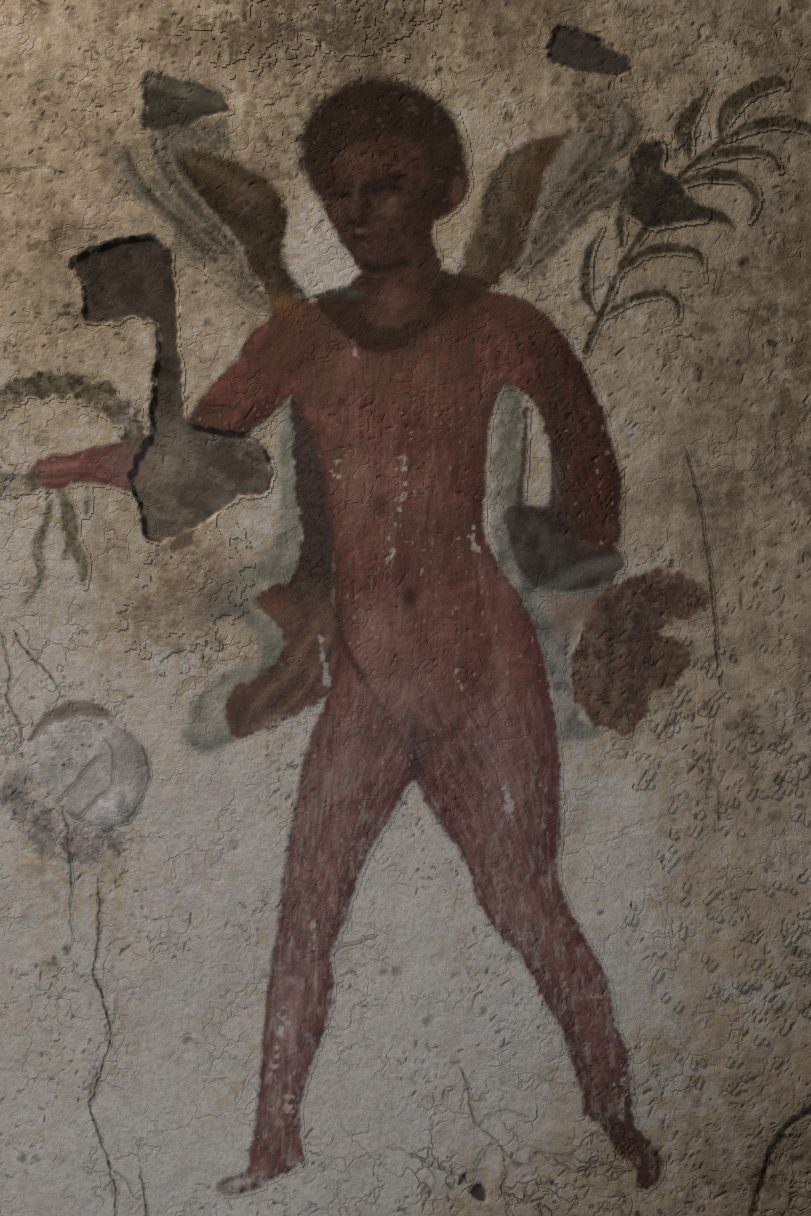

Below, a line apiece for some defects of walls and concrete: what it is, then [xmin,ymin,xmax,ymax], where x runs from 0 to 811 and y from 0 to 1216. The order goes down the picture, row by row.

peeling [137,67,235,134]
peeling [547,24,636,79]
flaking render [54,232,277,545]
crack [54,736,152,1216]
crack [747,1092,811,1216]